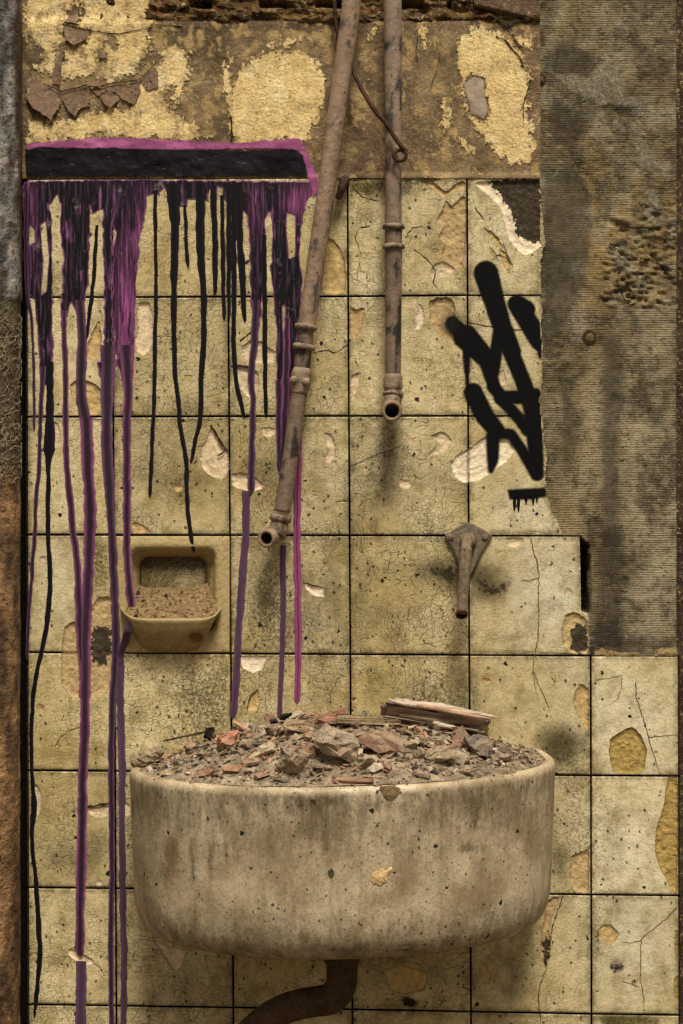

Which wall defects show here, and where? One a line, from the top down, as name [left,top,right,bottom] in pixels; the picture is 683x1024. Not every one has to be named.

peeling [22,0,214,144]
peeling [220,35,326,151]
peeling [424,24,543,285]
crack [405,226,522,331]
spalling [200,427,266,492]
spalling [426,431,515,483]
spalling [61,596,112,698]
crack [524,538,548,706]
spalling [609,727,647,774]
crack [598,676,670,772]
spalling [655,775,679,894]
crack [623,907,677,1010]